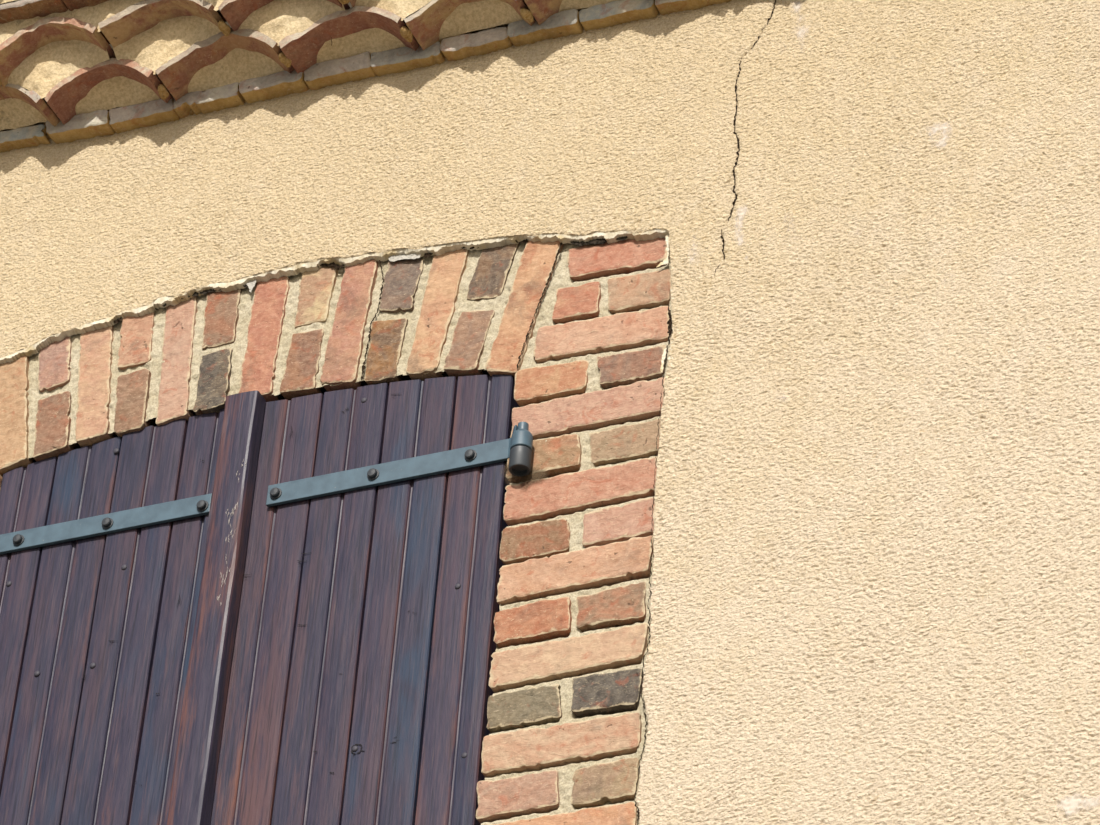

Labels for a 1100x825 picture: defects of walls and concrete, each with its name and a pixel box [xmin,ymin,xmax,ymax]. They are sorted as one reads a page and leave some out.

crack [714,0,776,275]